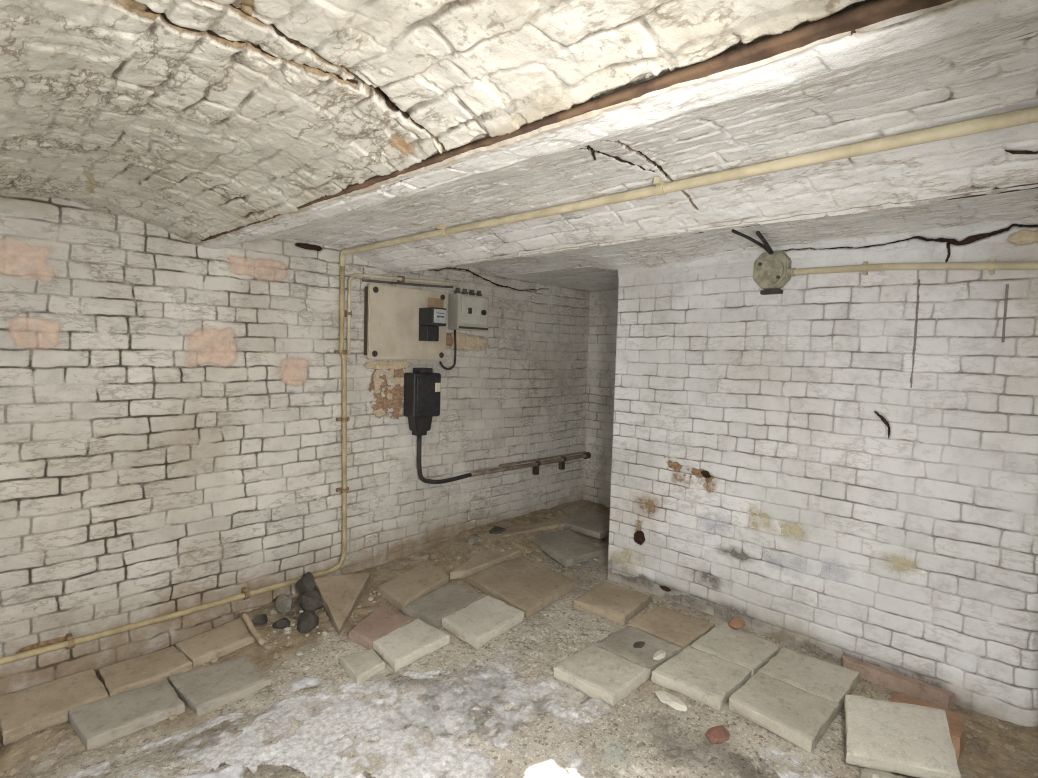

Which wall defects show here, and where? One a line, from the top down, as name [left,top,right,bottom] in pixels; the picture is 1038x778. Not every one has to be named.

crack [113,0,445,151]
crack [1005,148,1038,156]
crack [575,140,699,210]
peeling [10,317,59,348]
peeling [189,328,236,367]
spalling [364,360,411,419]
crack [874,411,890,438]
spalling [664,457,715,492]